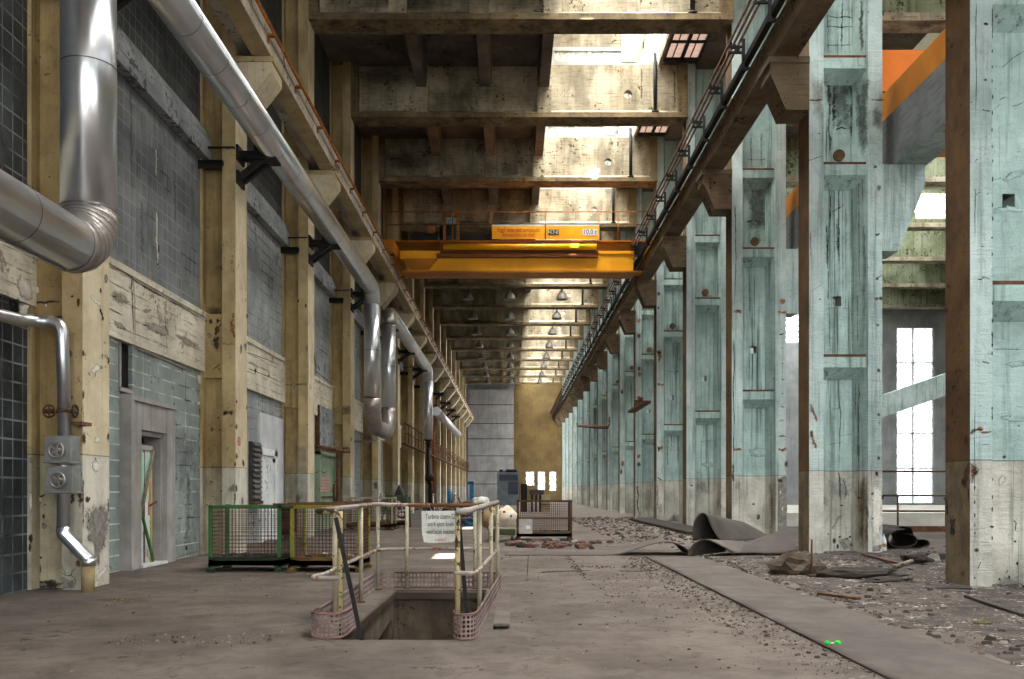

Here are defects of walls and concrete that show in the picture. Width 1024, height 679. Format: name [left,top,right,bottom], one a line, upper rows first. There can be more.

leakage [808,80,883,161]
leakage [747,189,765,229]
spalling [143,309,198,347]
spalling [208,318,219,350]
spalling [85,496,109,580]